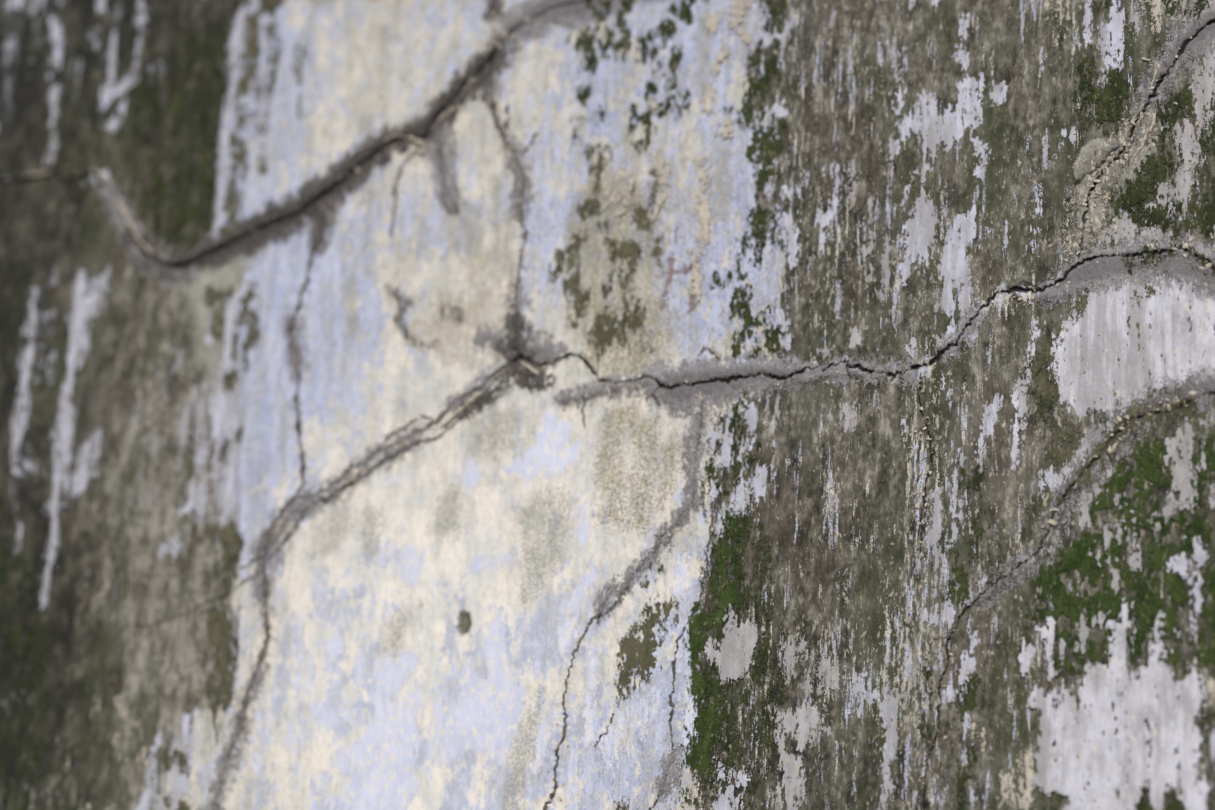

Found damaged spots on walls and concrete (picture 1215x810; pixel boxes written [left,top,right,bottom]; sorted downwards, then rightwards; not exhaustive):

water stain [169,230,272,411]
crack [0,0,928,810]
water stain [700,388,773,537]
crack [914,364,1215,810]
peeling [920,270,1215,810]
crack [929,0,1215,365]